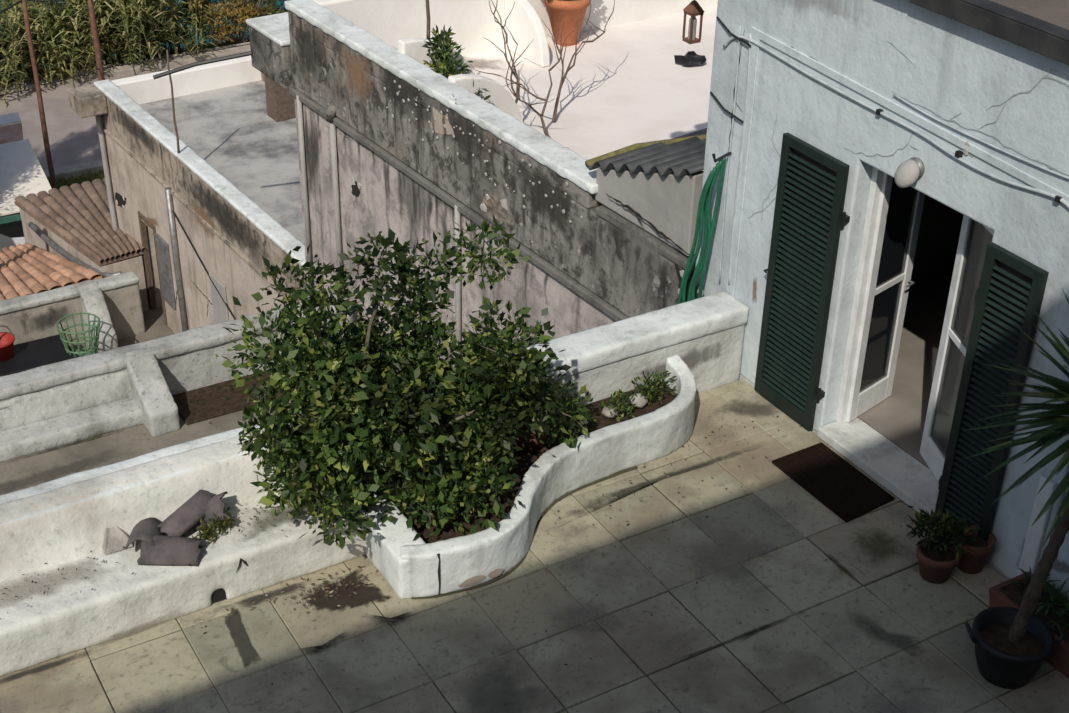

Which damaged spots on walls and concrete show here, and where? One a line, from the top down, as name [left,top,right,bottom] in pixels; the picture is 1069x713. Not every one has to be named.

leakage [291,16,320,66]
leakage [466,60,494,68]
leakage [303,114,319,186]
leakage [383,69,573,247]
crack [845,133,919,157]
crack [892,69,1069,176]
leakage [358,140,515,261]
leakage [20,307,65,328]